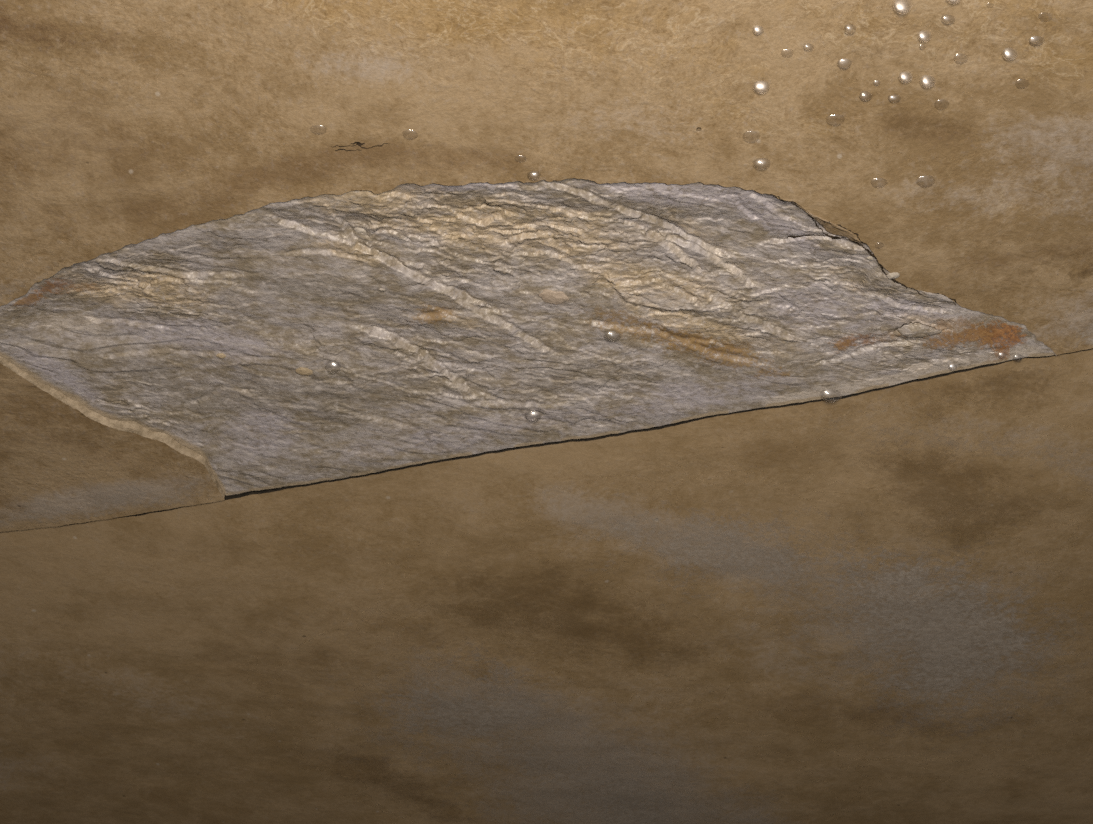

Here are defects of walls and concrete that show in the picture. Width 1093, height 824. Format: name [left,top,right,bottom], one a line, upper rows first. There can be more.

spalling [0,178,1057,498]
rust [923,321,1027,349]